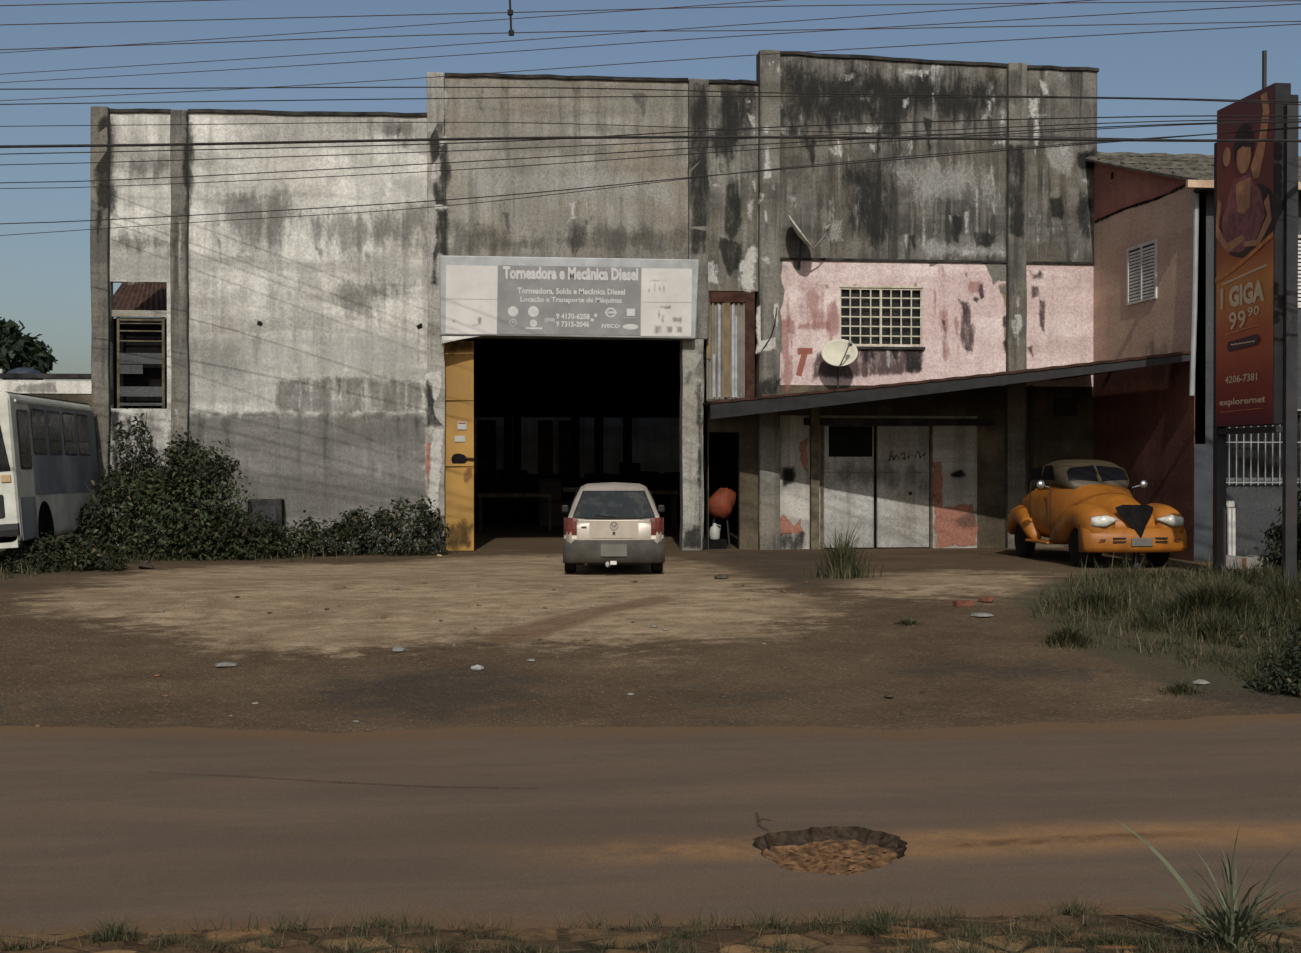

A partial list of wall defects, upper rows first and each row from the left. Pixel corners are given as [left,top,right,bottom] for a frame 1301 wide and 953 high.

water stain [96,116,115,232]
water stain [690,84,771,292]
water stain [773,61,1005,246]
water stain [950,190,1003,256]
water stain [993,80,1048,236]
water stain [1050,149,1091,238]
water stain [396,377,442,427]